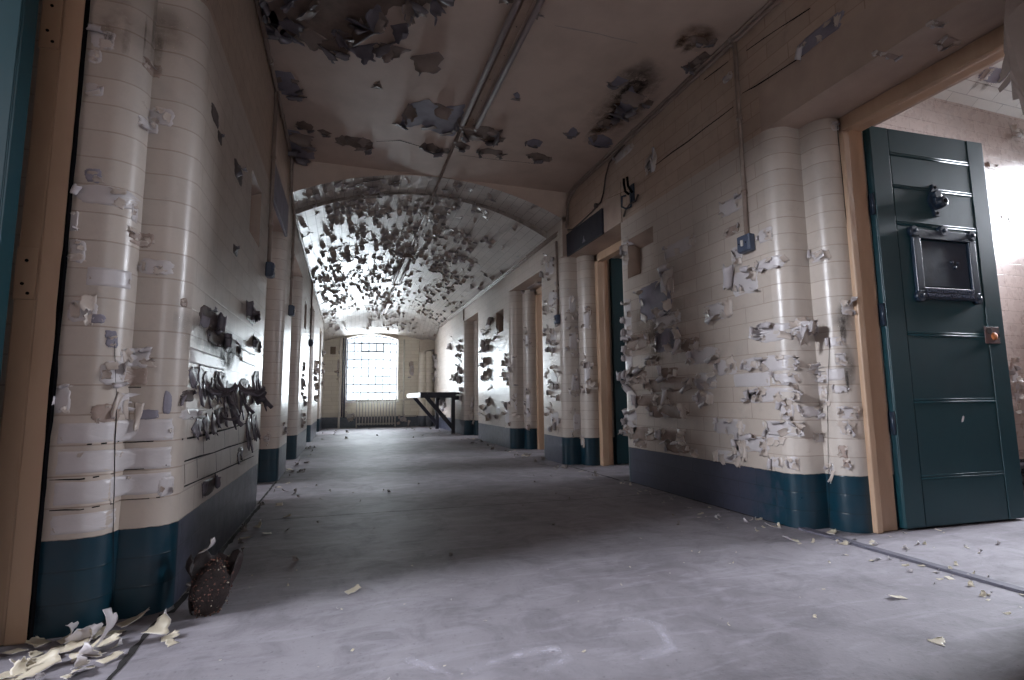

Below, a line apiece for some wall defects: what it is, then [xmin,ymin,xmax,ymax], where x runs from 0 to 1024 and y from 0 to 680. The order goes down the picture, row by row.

peeling [258,0,455,76]
crack [704,8,810,80]
peeling [275,70,307,102]
peeling [392,99,507,160]
peeling [524,139,552,164]
peeling [563,76,654,165]
peeling [294,178,599,448]
peeling [50,168,274,535]
peeling [616,271,861,484]